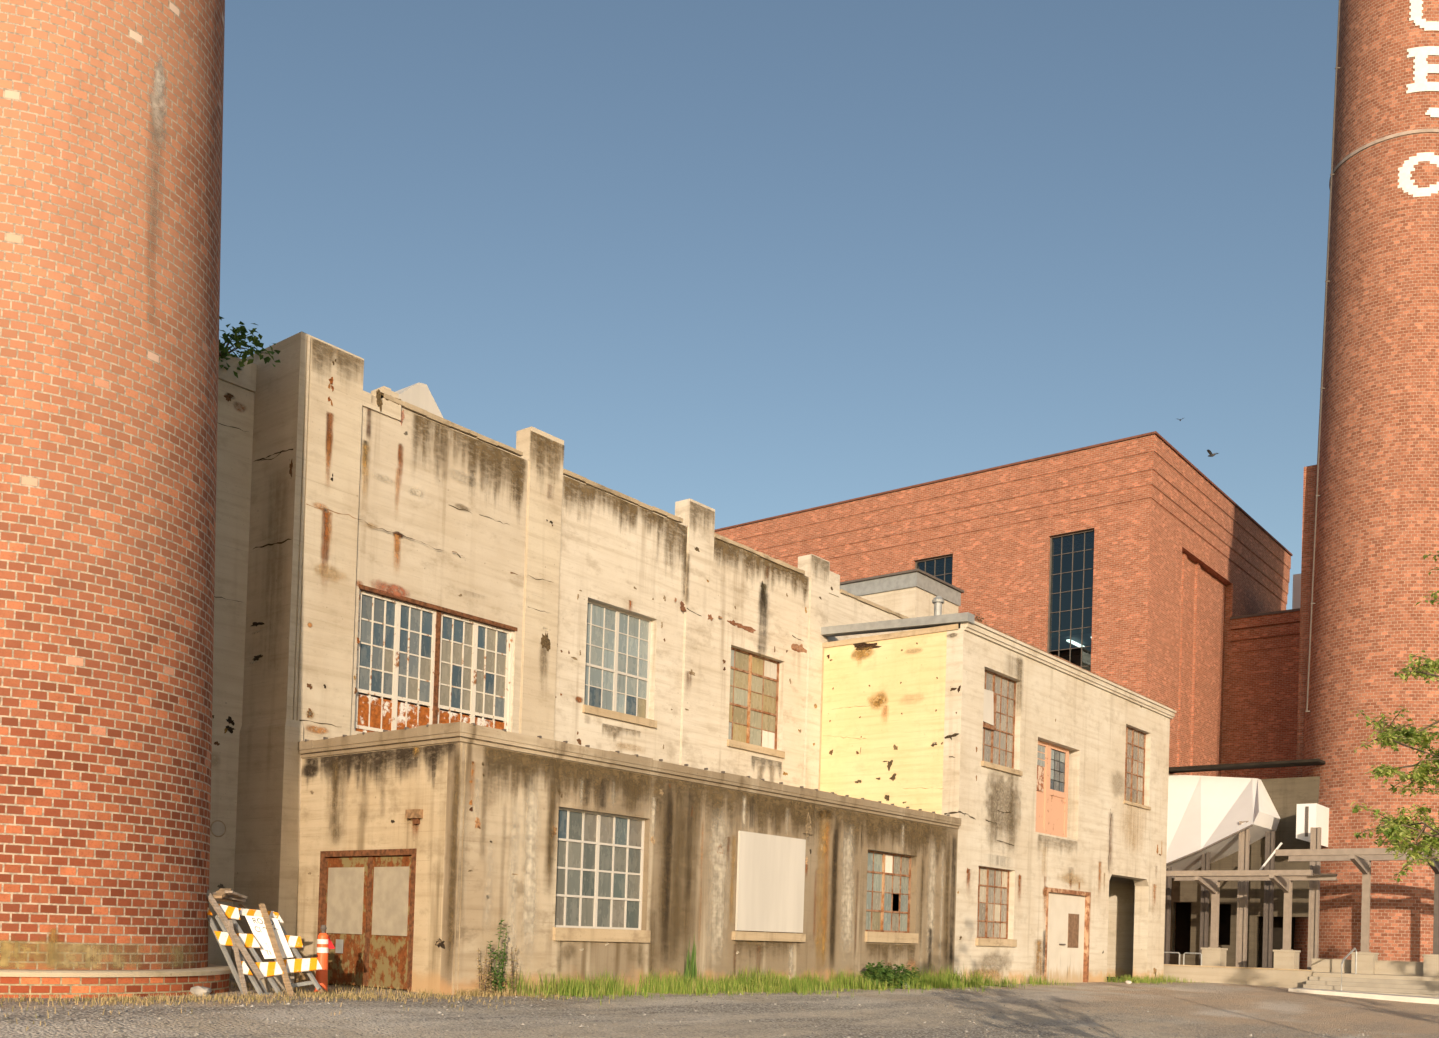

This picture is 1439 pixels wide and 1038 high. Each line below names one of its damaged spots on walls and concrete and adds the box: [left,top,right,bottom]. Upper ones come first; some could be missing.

water stain [150,61,165,141]
corrosion [326,359,336,467]
corrosion [322,508,331,553]
water stain [415,414,714,600]
water stain [485,747,956,979]